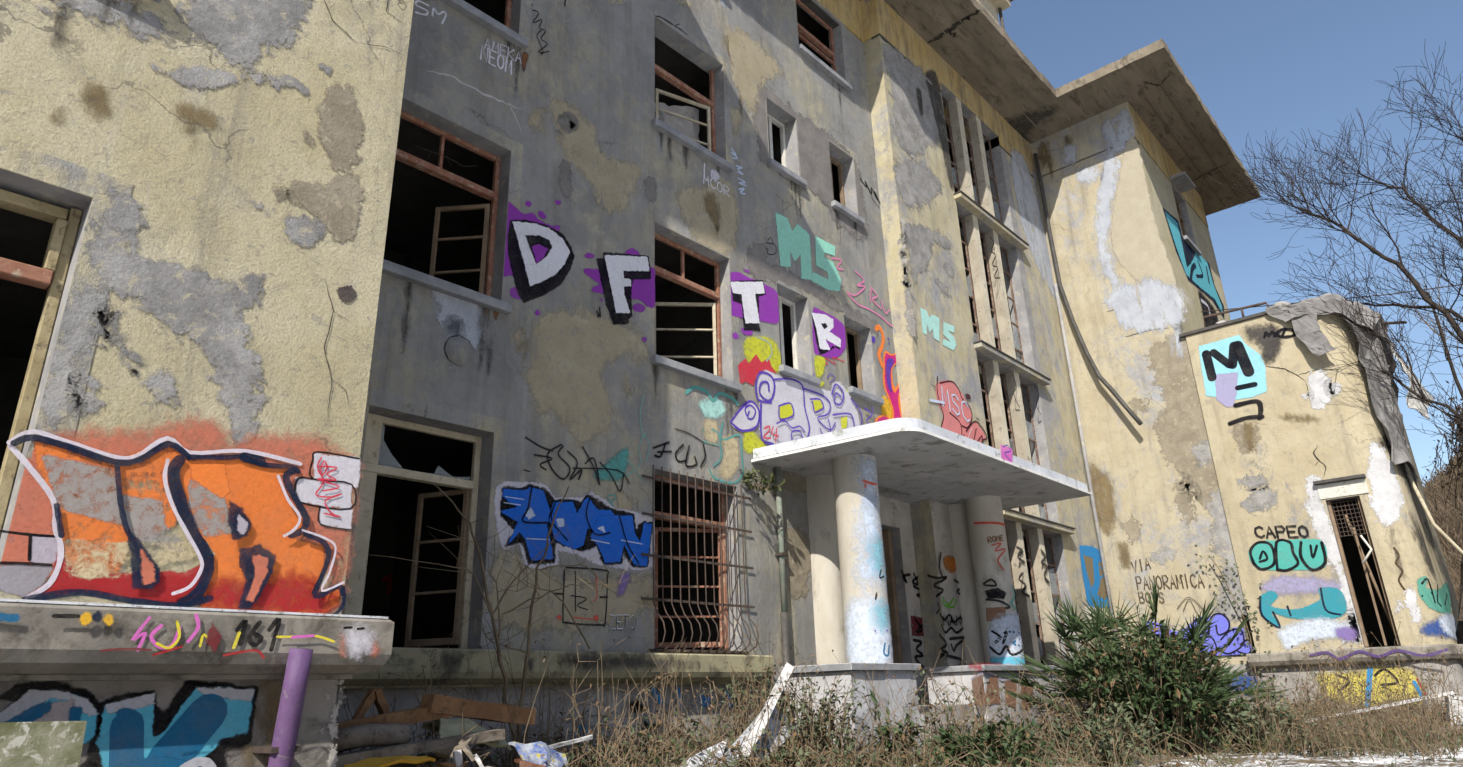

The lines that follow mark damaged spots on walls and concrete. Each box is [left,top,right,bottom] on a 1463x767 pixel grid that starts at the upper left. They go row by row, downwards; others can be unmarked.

peeling [4,0,366,248]
crack [324,0,525,131]
peeling [40,185,278,447]
peeling [1328,381,1343,395]